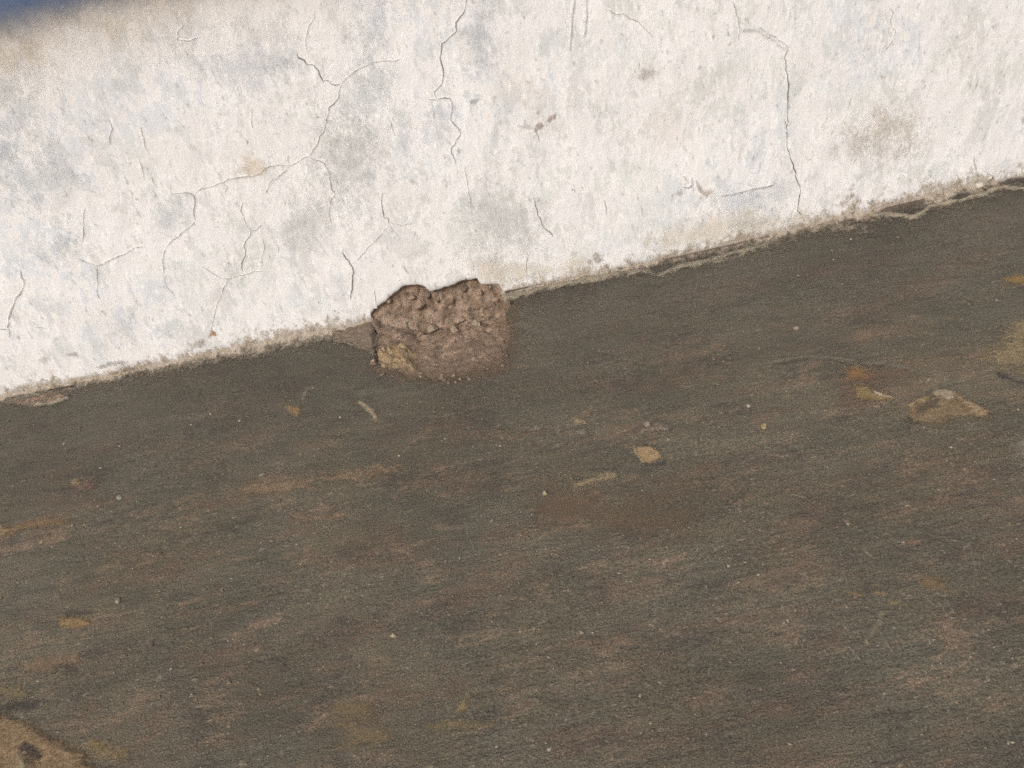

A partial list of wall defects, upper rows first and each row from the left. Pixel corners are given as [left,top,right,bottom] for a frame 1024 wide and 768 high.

crack [0,271,47,338]
crack [77,10,401,331]
crack [341,193,415,308]
crack [427,0,473,215]
crack [731,1,806,224]